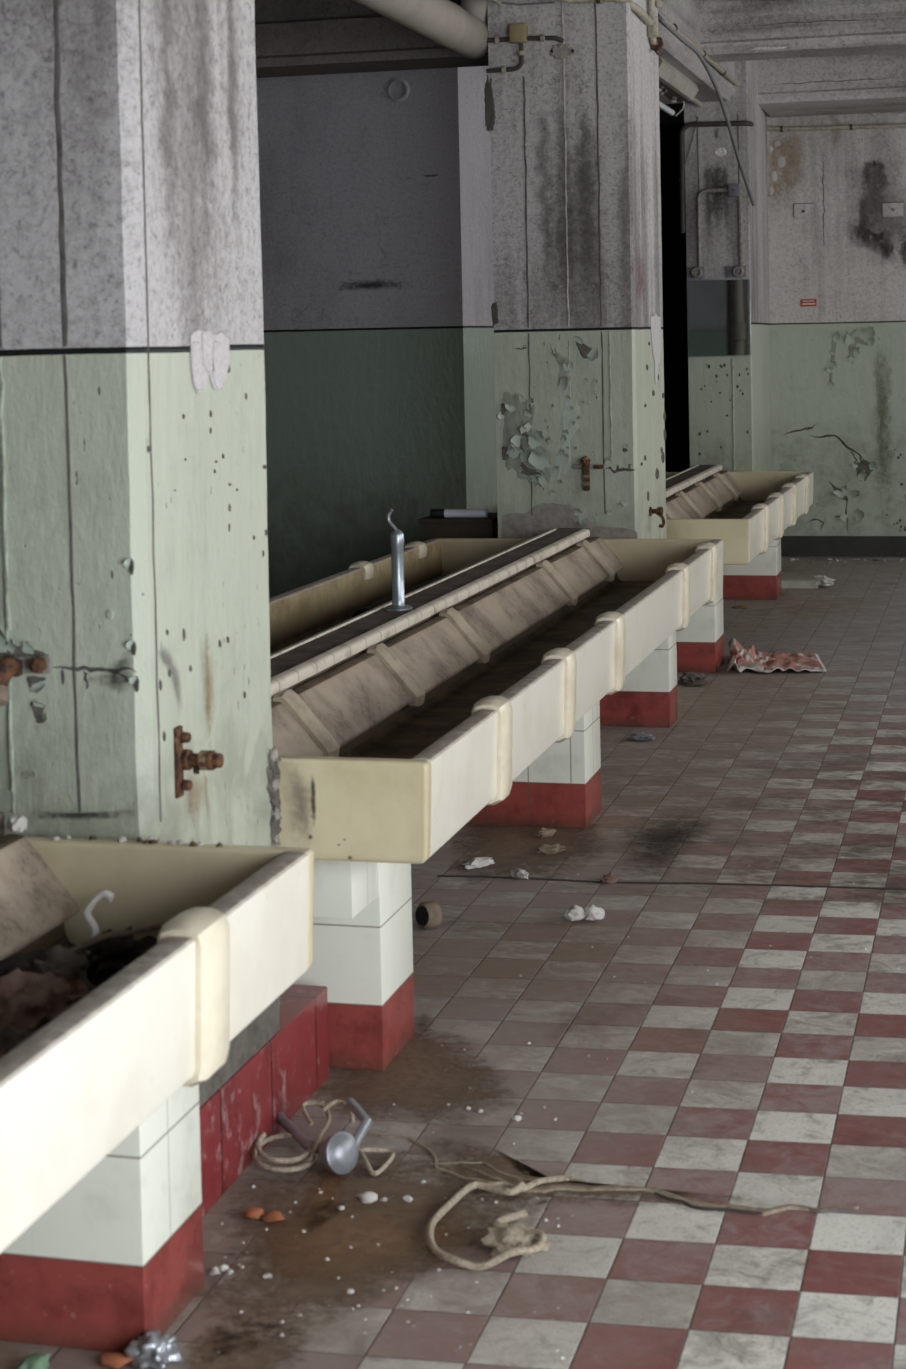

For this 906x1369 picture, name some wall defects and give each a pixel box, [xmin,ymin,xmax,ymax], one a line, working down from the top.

water stain [858,163,906,262]
peeling [549,336,599,393]
peeling [827,326,875,392]
peeling [497,391,637,539]
peeling [641,365,666,501]
crack [784,424,865,463]
crack [808,499,848,530]
peeling [0,629,49,656]
peeling [26,676,47,723]